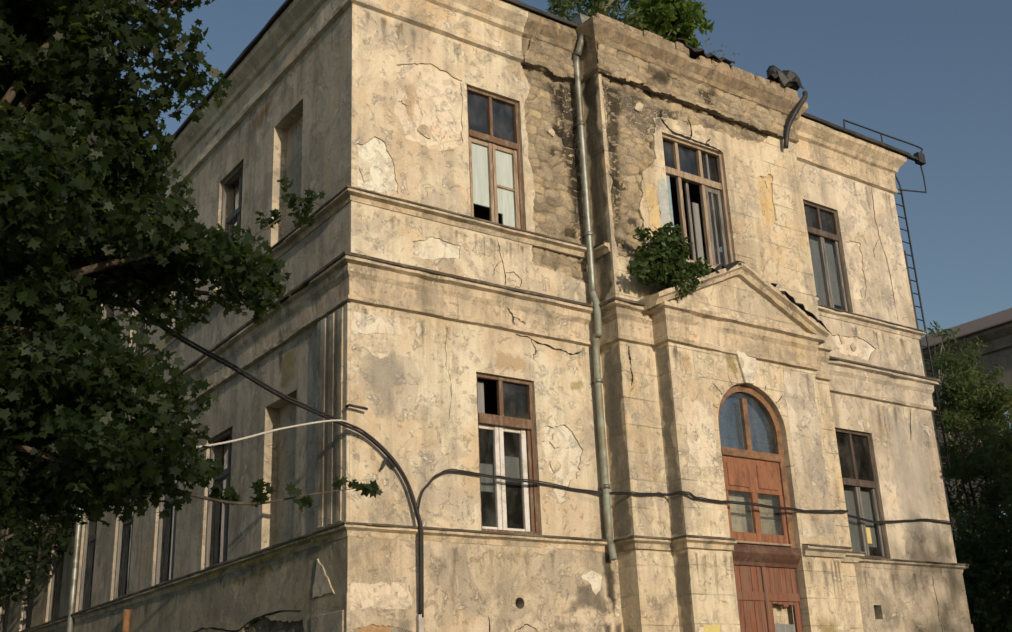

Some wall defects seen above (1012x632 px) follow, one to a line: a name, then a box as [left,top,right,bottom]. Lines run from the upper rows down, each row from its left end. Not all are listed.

peeling [357,137,397,193]
flaking render [521,37,586,245]
flaking render [597,44,793,258]
flaking render [531,246,589,284]
crack [493,239,582,358]
water stain [656,347,678,469]
water stain [668,485,683,534]
peeling [349,582,413,610]
peeling [581,570,602,595]
water stain [578,556,615,611]
water stain [676,553,691,631]
flaking render [245,617,304,632]